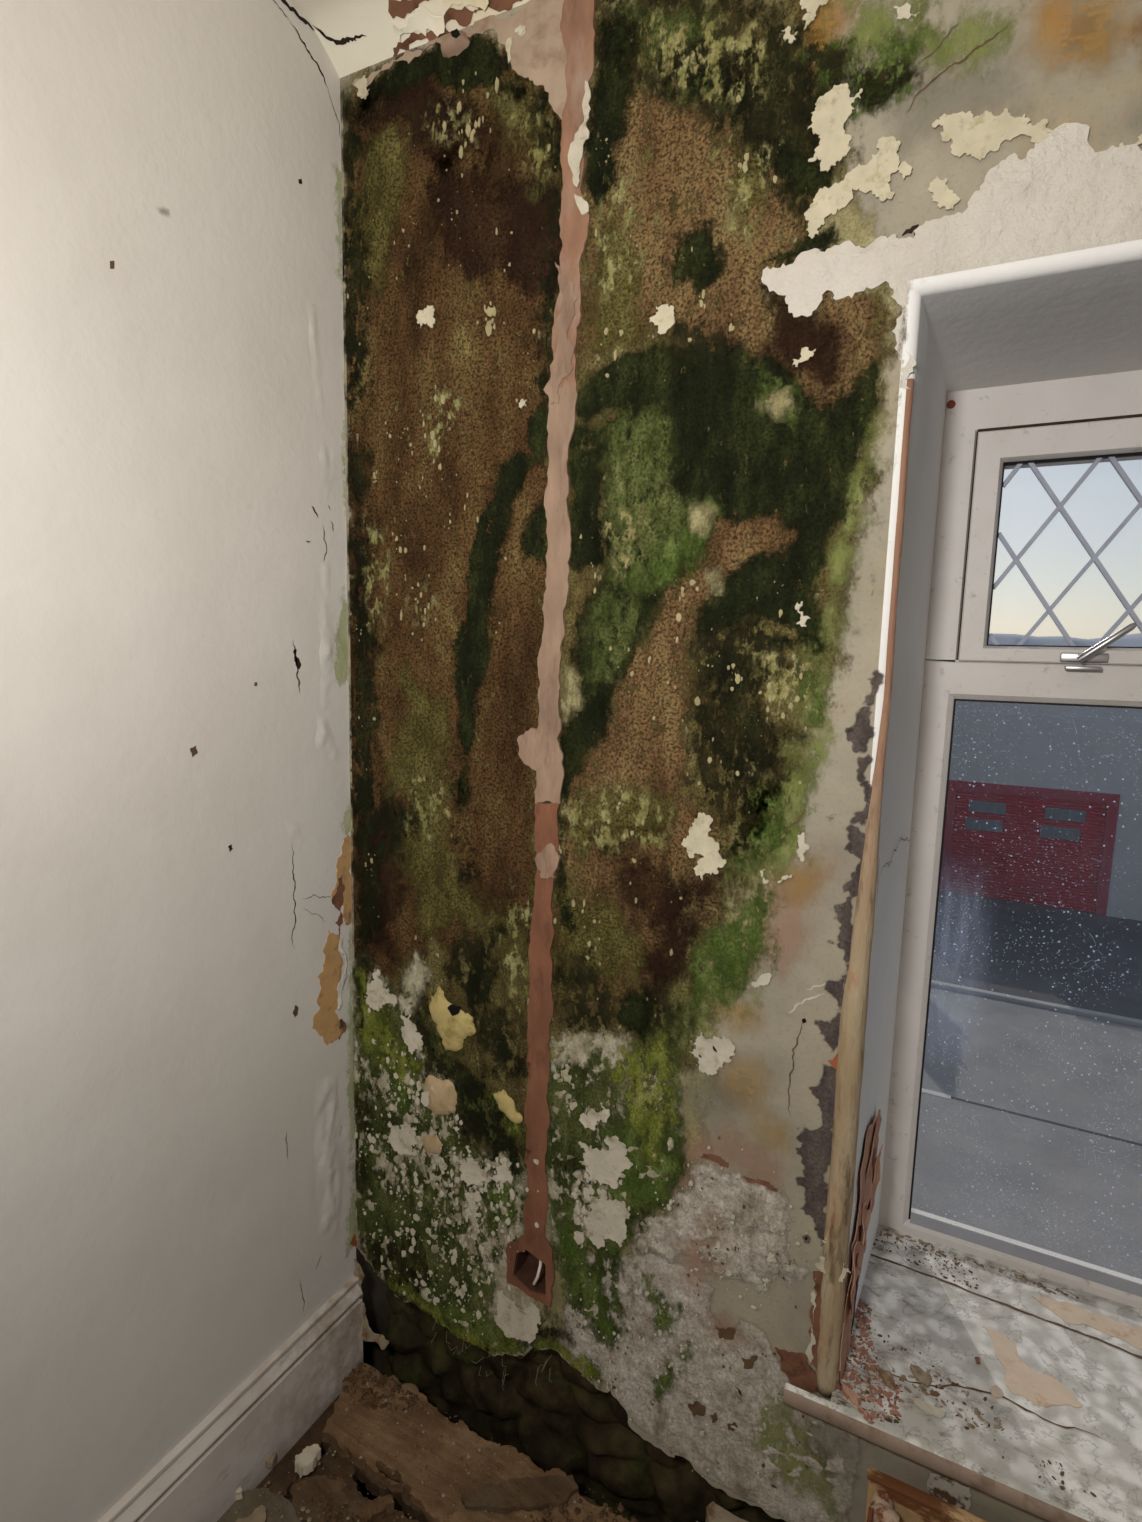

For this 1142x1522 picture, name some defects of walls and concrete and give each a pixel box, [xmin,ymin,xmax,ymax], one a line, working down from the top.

crack [273,0,365,138]
flaking render [352,0,591,216]
peeling [781,0,829,44]
peeling [893,2,920,20]
peeling [761,83,1142,389]
leakage [334,0,907,1345]
flaking render [312,671,884,1522]